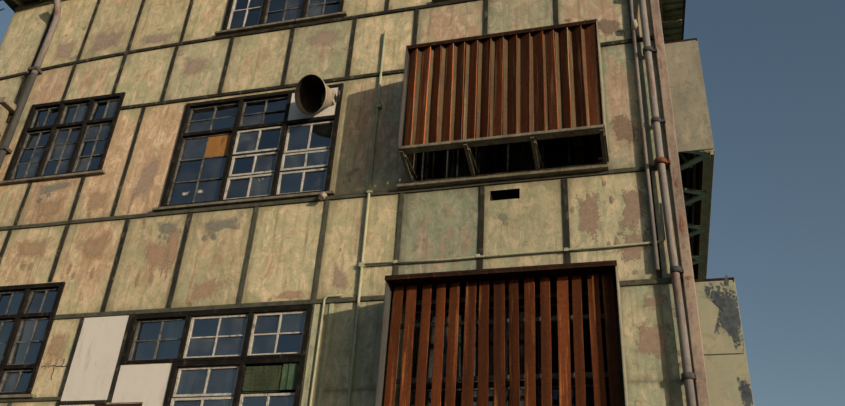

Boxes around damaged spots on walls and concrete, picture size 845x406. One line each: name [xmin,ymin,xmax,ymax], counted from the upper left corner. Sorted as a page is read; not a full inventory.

peeling [571,180,652,274]
peeling [705,273,744,354]
peeling [738,377,753,406]